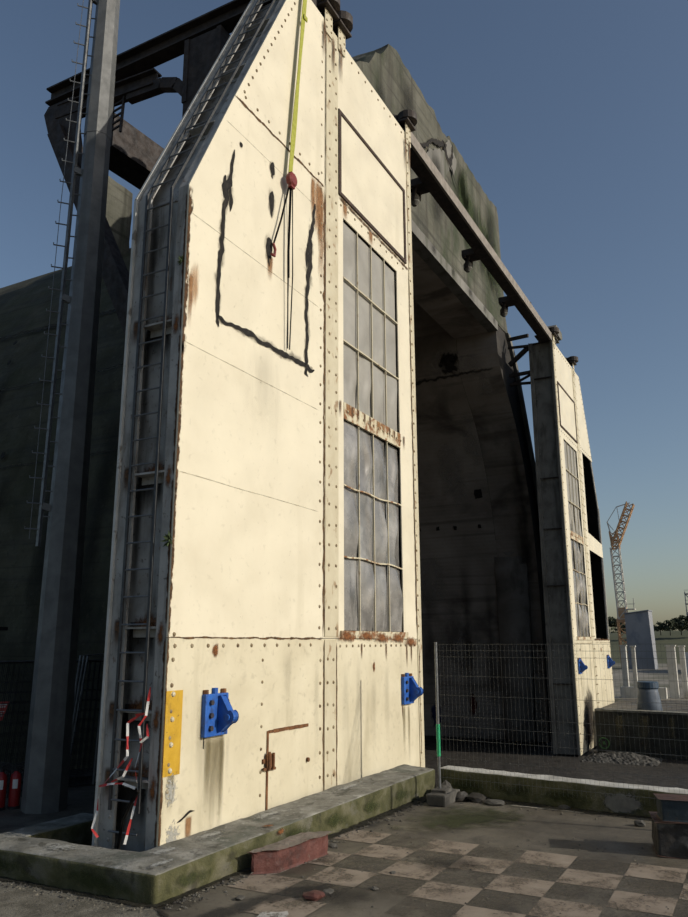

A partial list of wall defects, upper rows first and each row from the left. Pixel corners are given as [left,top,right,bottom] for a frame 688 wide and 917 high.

rust [323,22,343,123]
rust [341,198,408,269]
rust [238,97,326,626]
rust [340,401,414,473]
rust [127,188,324,847]
water stain [206,740,223,771]
rust [336,571,420,782]
water stain [583,691,594,752]